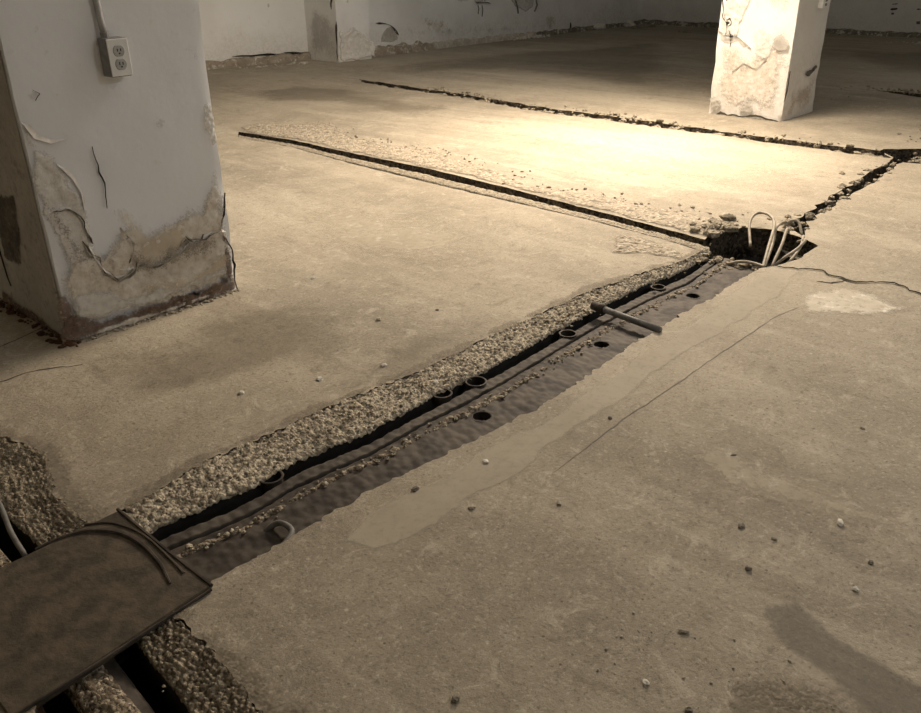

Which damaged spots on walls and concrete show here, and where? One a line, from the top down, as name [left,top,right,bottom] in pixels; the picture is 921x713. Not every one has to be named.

peeling [710,0,786,113]
peeling [0,56,231,334]
crack [0,251,11,286]
rust [2,236,237,341]
crack [765,265,921,294]
crack [554,307,799,472]